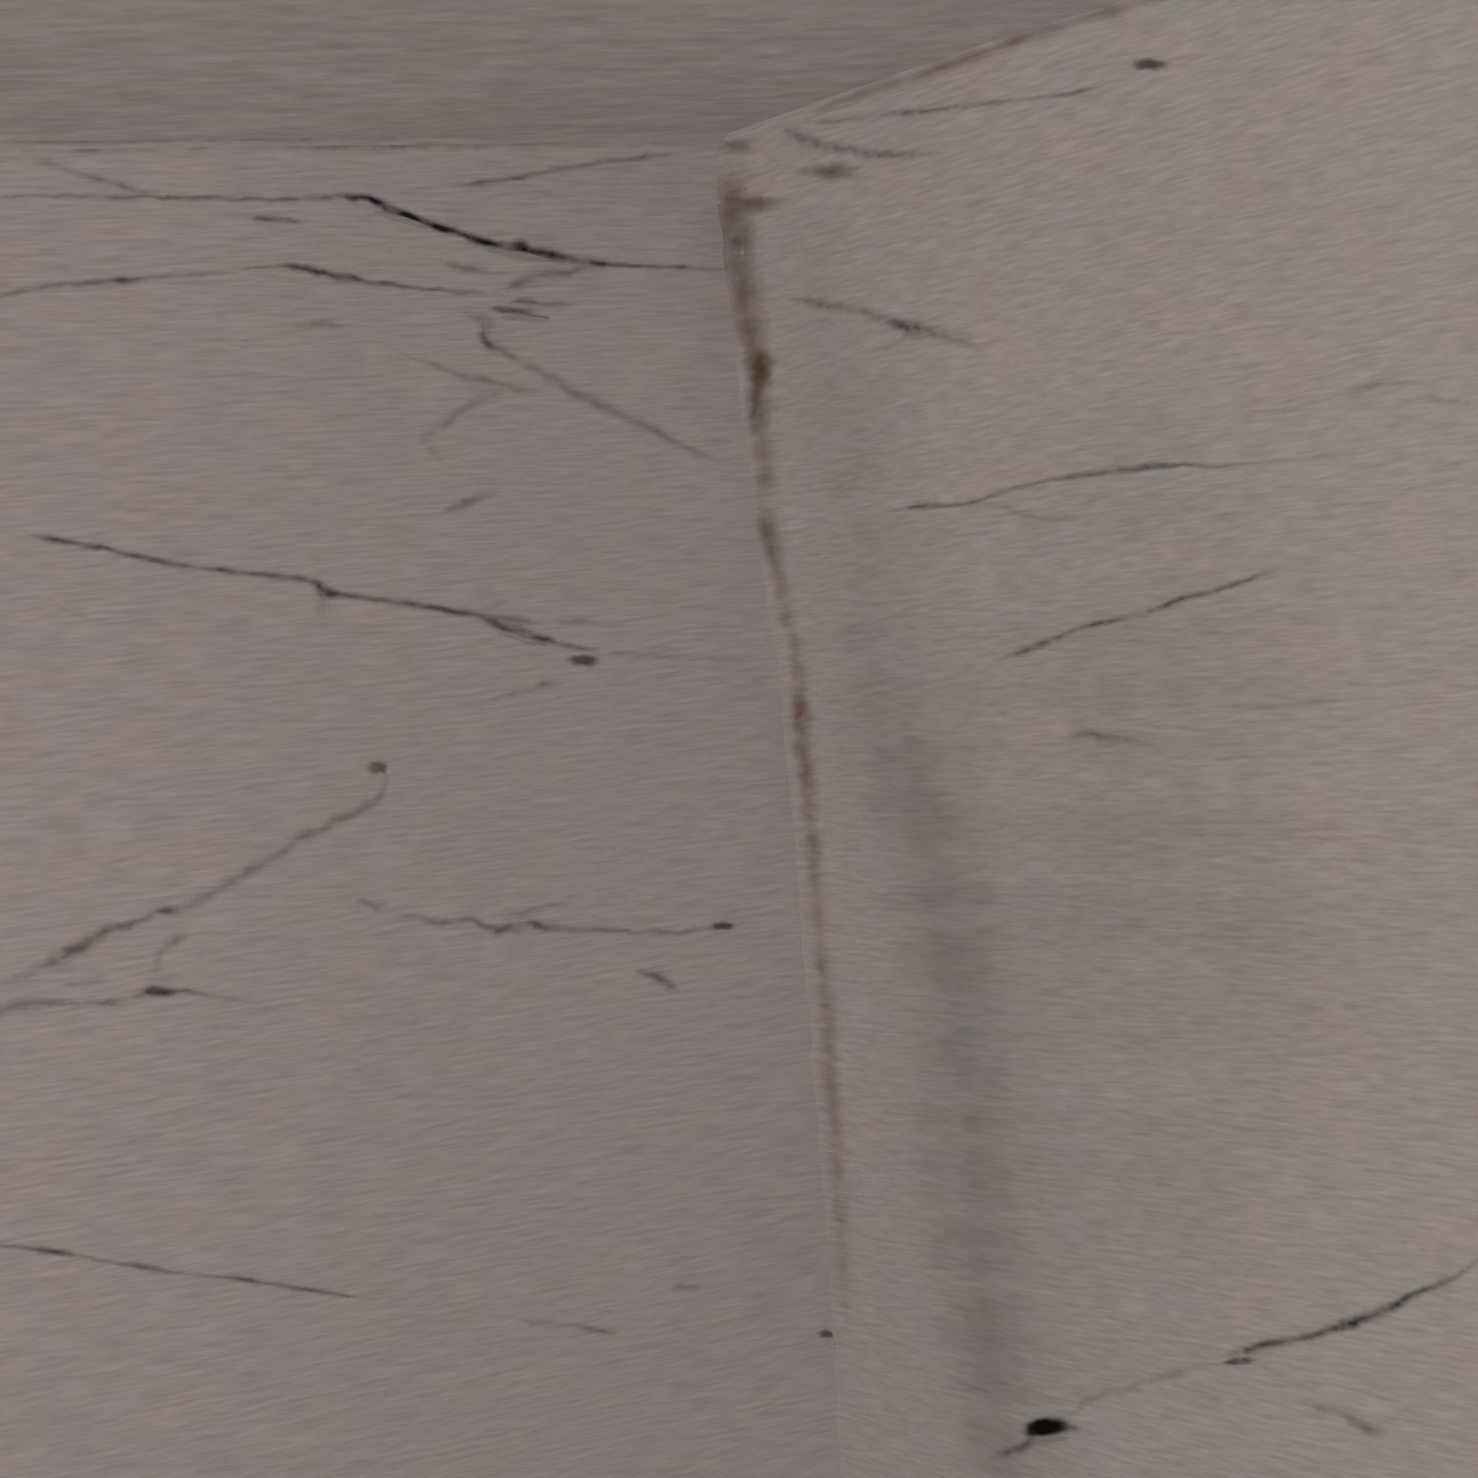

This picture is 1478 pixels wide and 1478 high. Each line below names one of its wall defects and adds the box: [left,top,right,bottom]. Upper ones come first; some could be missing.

crack [349,195,606,265]
crack [292,266,357,279]
crack [485,310,550,347]
crack [428,606,589,663]
crack [373,763,385,772]
crack [716,922,730,930]
crack [1309,1296,1408,1337]
crack [1227,1342,1272,1364]